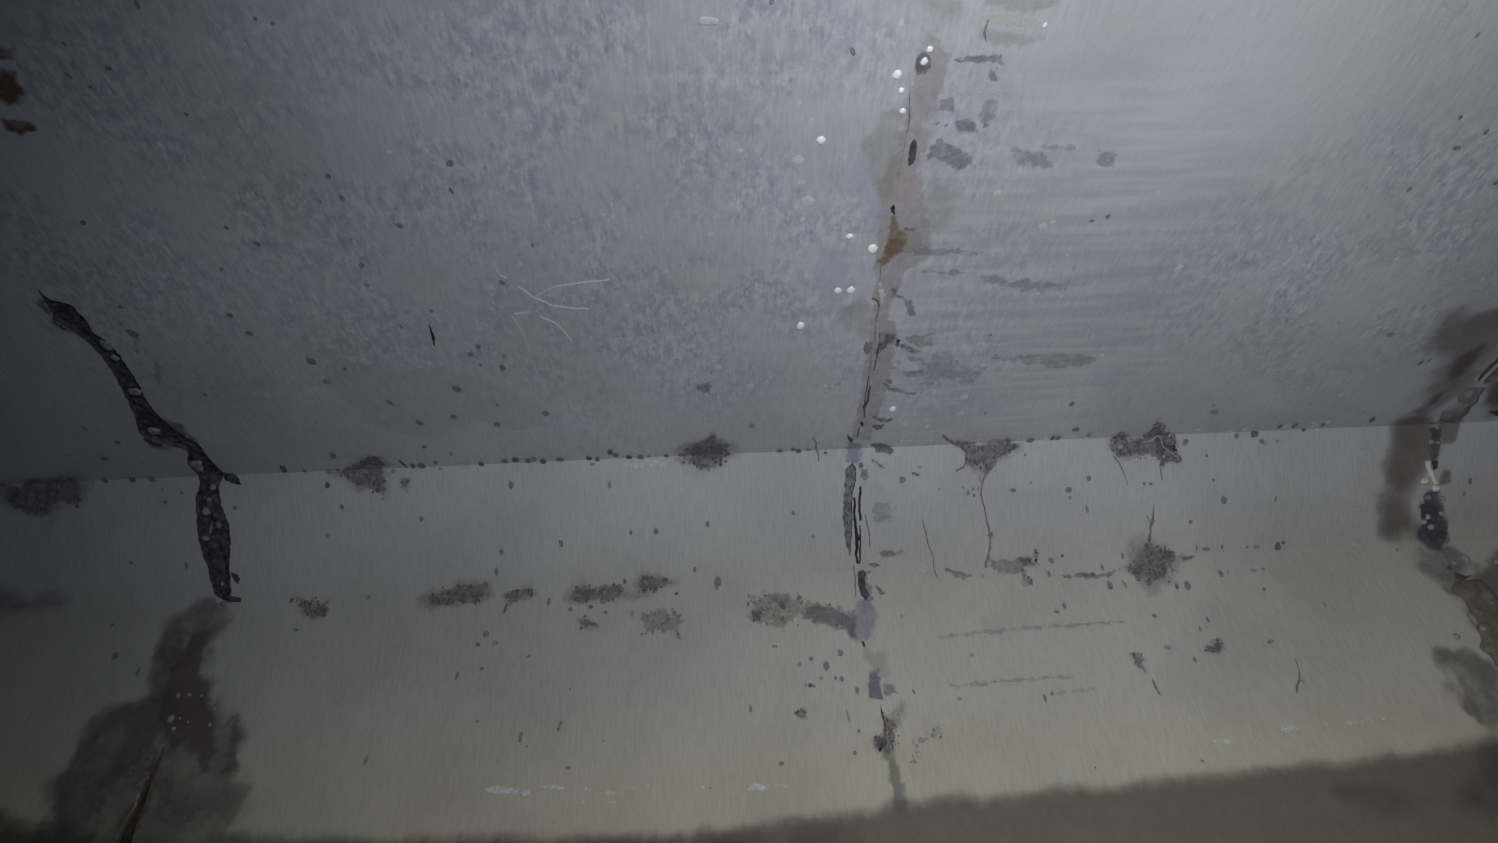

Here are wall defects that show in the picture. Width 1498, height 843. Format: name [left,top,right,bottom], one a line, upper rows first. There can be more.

corrosion [0,49,36,134]
corrosion [878,219,914,264]
crack [813,293,880,461]
damp [623,436,730,470]
damp [1383,415,1462,536]
crack [853,486,870,597]
damp [1132,539,1193,586]
damp [574,575,682,636]
damp [747,593,846,630]
damp [0,602,264,843]
crack [874,710,899,750]
damp [564,740,1498,843]